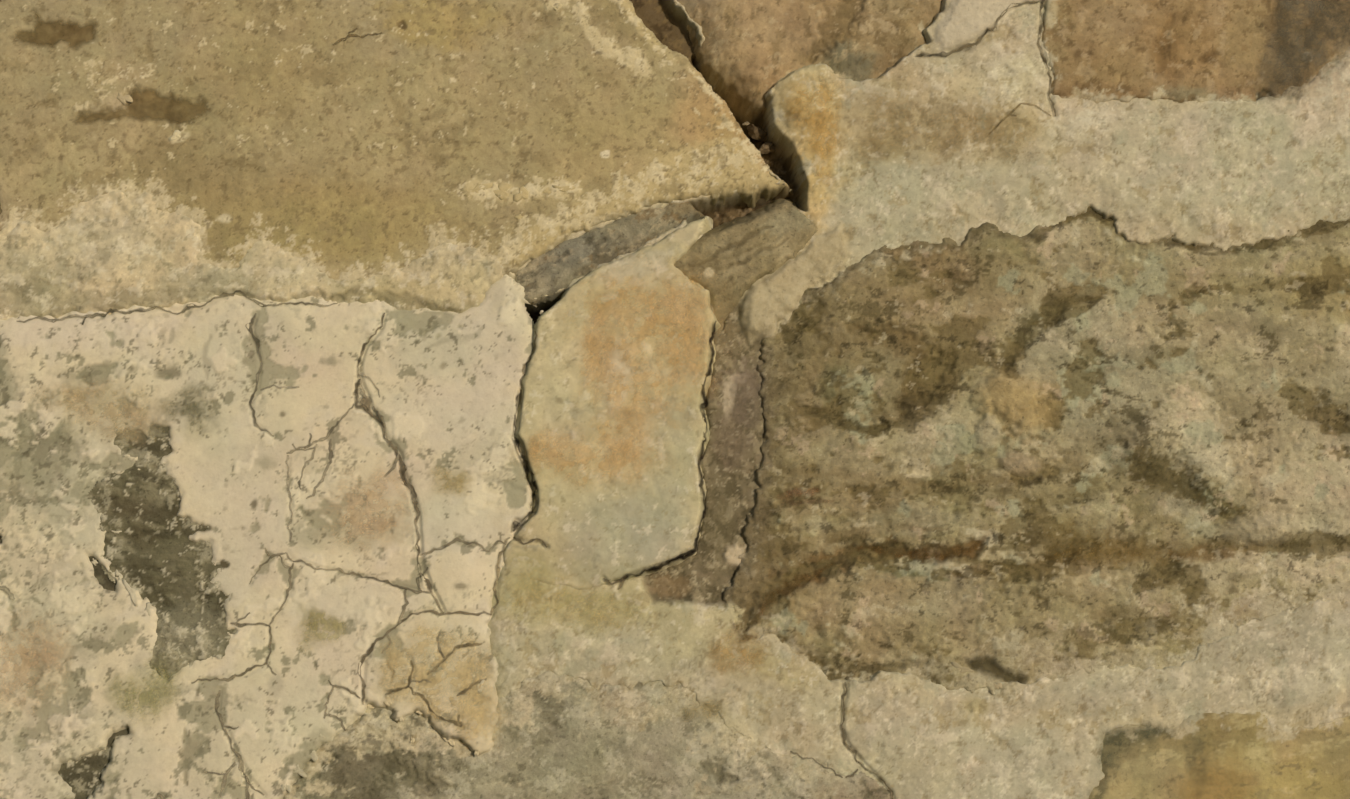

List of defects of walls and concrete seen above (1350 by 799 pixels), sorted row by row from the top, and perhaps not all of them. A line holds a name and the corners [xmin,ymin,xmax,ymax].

crack [916,0,1056,133]
crack [603,322,716,589]
crack [0,586,15,600]
flaking render [87,423,237,680]
crack [18,290,547,799]
flaking render [58,728,129,799]
crack [790,682,893,799]